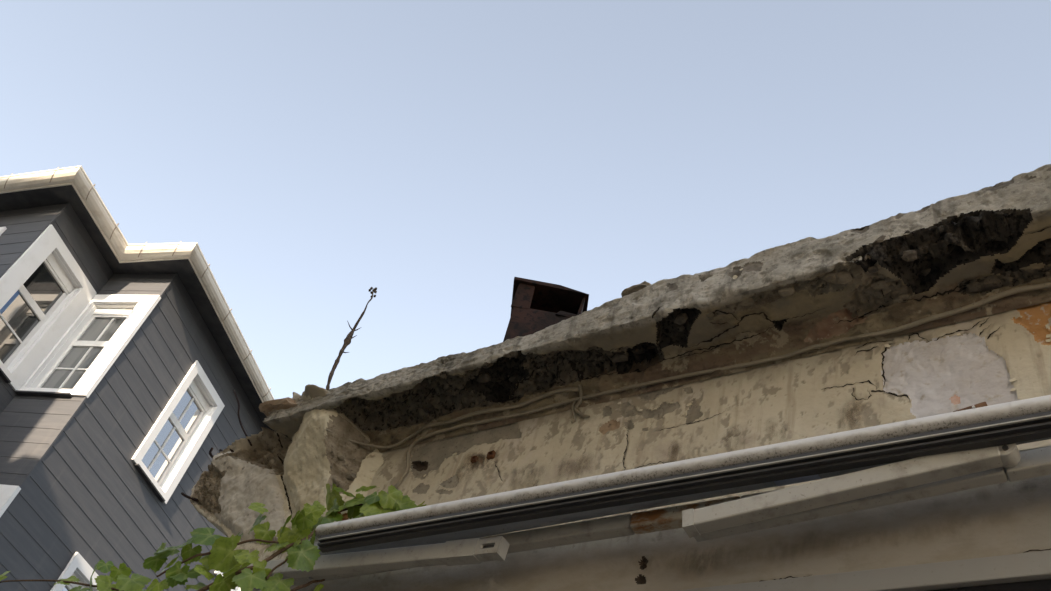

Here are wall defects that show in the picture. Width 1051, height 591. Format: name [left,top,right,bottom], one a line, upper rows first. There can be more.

crack [477,346,628,403]
spalling [324,208,1051,495]
crack [652,280,979,363]
crack [825,320,1000,401]
spalling [191,427,294,515]